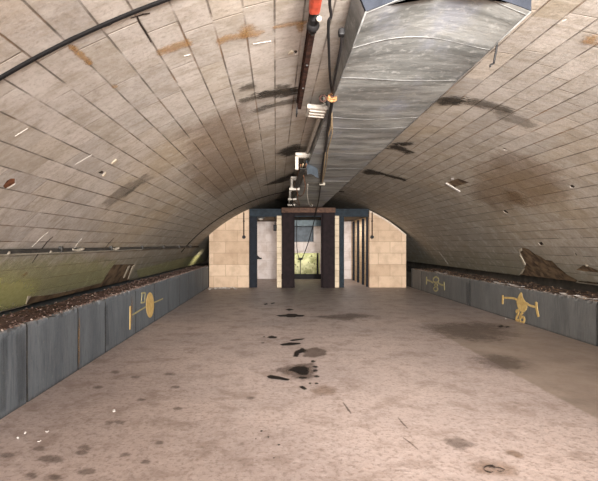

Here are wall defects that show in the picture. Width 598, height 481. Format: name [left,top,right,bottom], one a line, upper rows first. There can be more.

rust [218,26,263,43]
rust [158,40,191,55]
damp [240,83,298,112]
damp [437,96,515,113]
damp [277,144,303,157]
damp [386,142,414,155]
damp [364,169,406,181]
damp [265,173,296,204]
spalling [519,248,577,282]